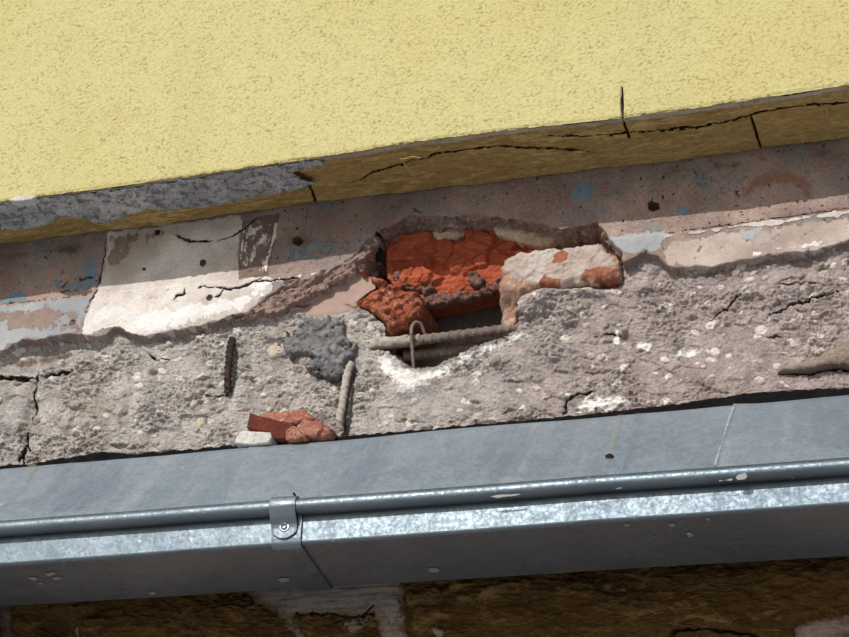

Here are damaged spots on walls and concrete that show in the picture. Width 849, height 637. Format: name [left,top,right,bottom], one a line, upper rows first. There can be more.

crack [350,88,849,183]
spalling [0,160,849,466]
crack [712,294,741,321]
crack [767,282,839,339]
crack [0,370,74,465]